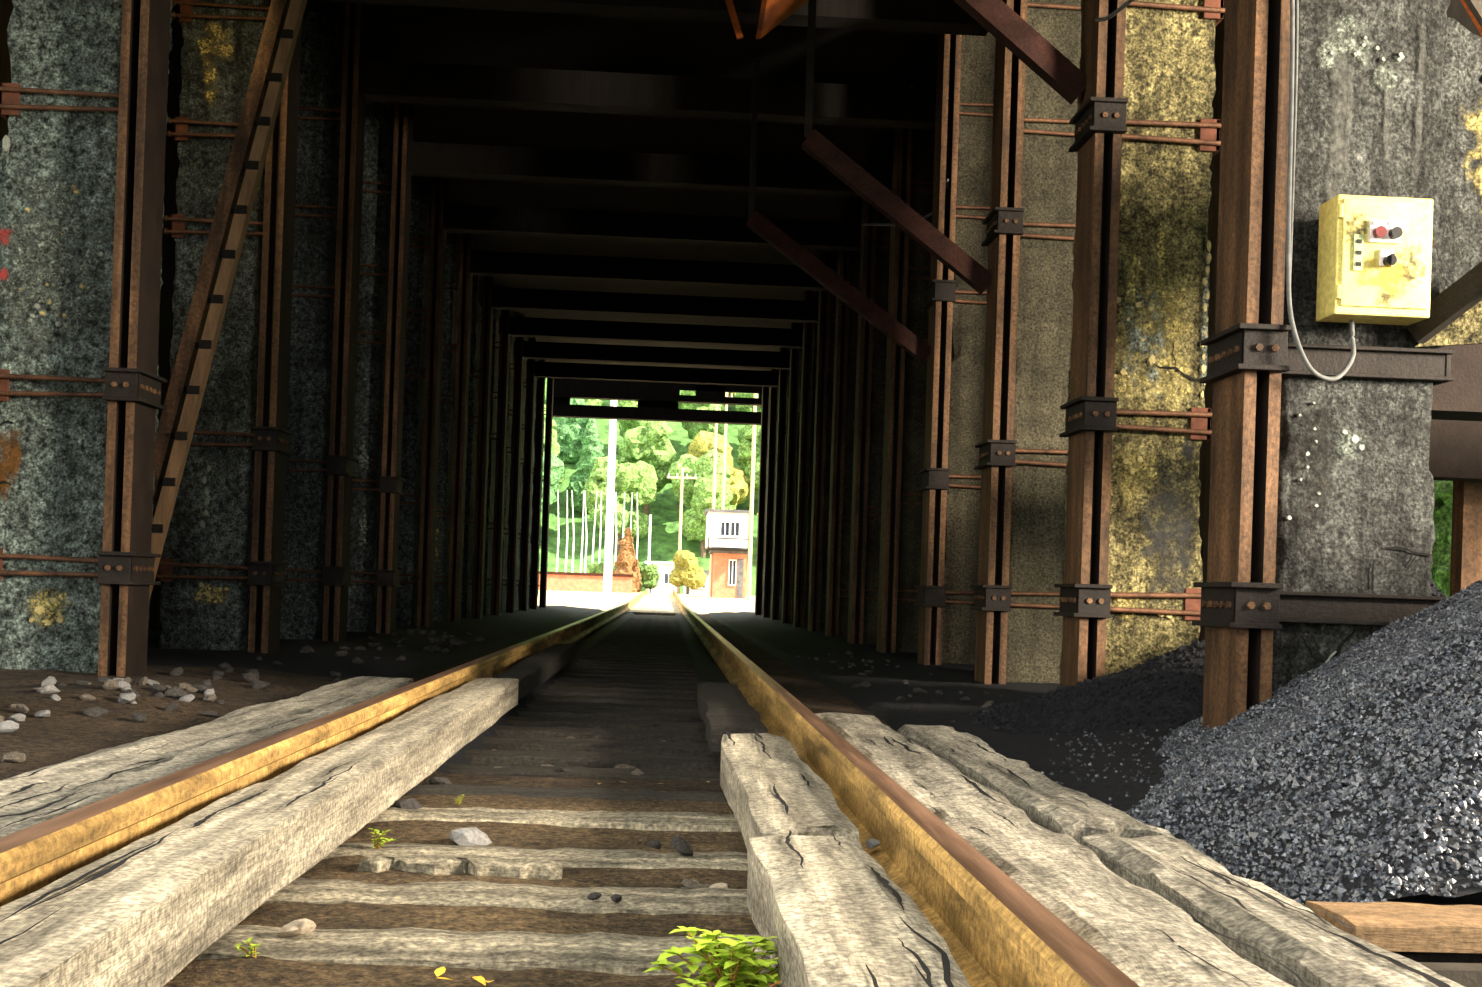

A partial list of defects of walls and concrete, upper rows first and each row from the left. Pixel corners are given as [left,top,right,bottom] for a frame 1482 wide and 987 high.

damp [1467,113,1482,185]
damp [1117,224,1188,399]
corrosion [0,431,21,489]